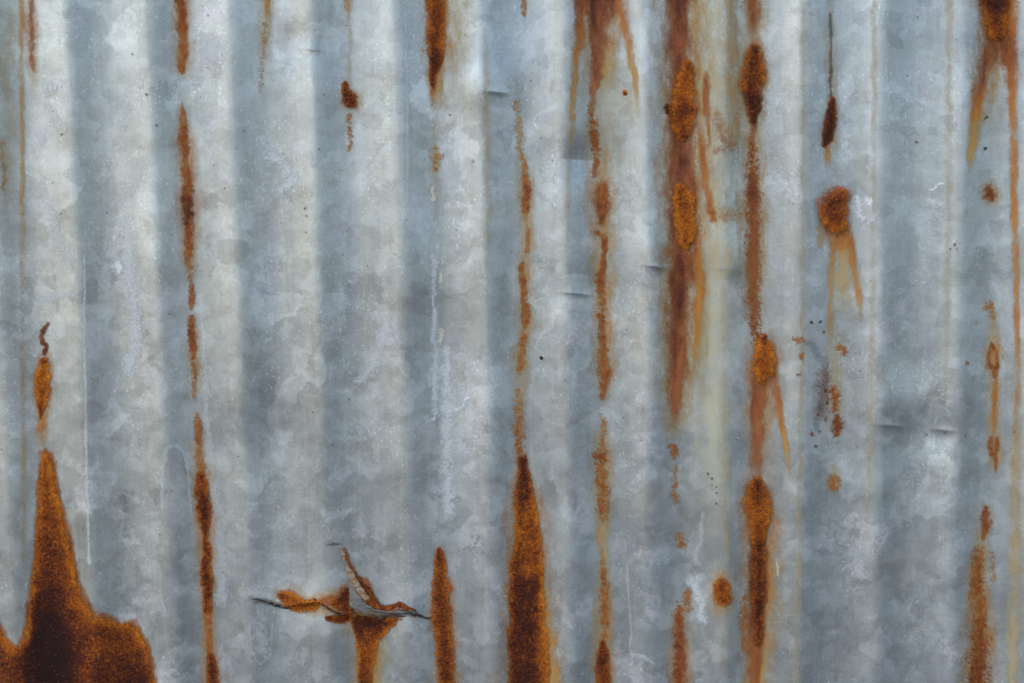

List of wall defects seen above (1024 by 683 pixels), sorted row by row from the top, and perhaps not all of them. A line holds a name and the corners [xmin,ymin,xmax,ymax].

corrosion [178,102,198,399]
corrosion [425,0,461,100]
corrosion [570,0,638,400]
corrosion [662,0,717,415]
corrosion [713,0,789,683]
corrosion [967,0,1019,354]
corrosion [0,449,156,683]
corrosion [193,413,219,683]
corrosion [277,586,402,683]
crack [251,598,431,620]
corrosion [431,547,456,683]
corrosion [507,388,560,683]